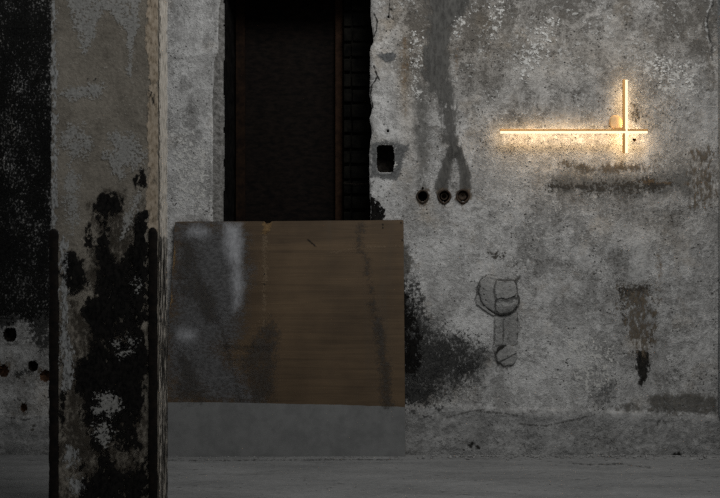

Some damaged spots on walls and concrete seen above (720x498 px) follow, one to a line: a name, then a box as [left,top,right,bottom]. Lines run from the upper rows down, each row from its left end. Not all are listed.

mould [0,0,52,356]
mould [133,167,147,191]
water stain [417,0,471,191]
water stain [545,159,687,198]
mould [58,189,149,498]
water stain [404,246,491,418]